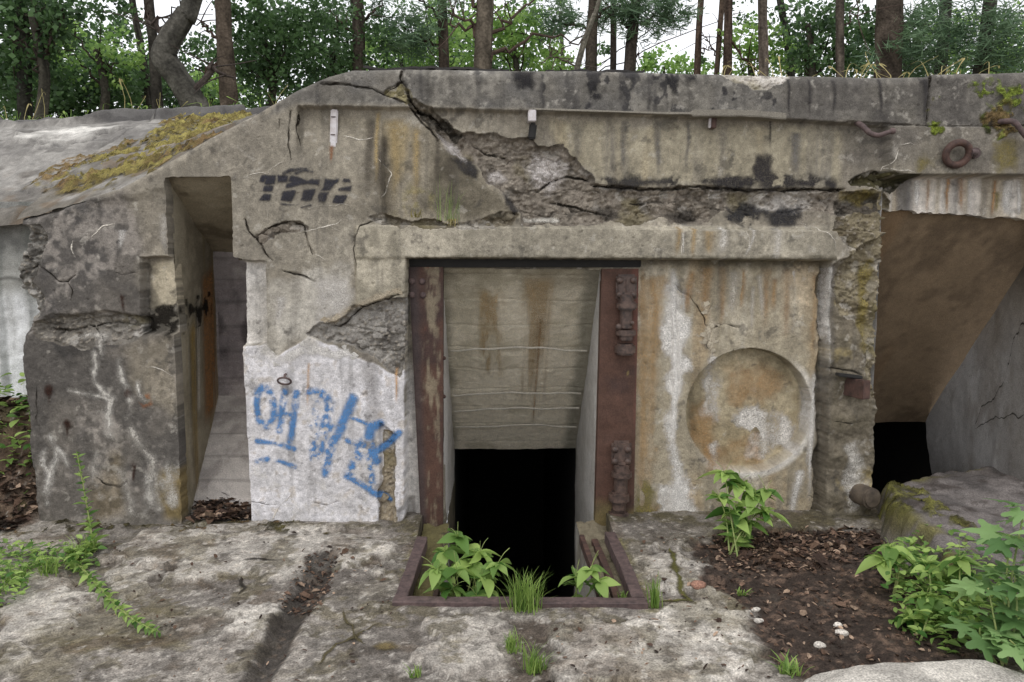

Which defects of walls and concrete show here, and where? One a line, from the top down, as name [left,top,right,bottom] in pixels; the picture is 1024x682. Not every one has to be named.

leakage [514,72,533,89]
leakage [665,75,695,94]
spalling [18,223,152,351]
crack [245,136,392,279]
spalling [271,288,410,377]
leakage [602,175,678,191]
spalling [368,84,920,400]
leakage [703,133,836,250]
leakage [85,333,114,436]
leakage [657,274,696,512]
leakage [41,435,67,489]
leakage [129,427,177,511]